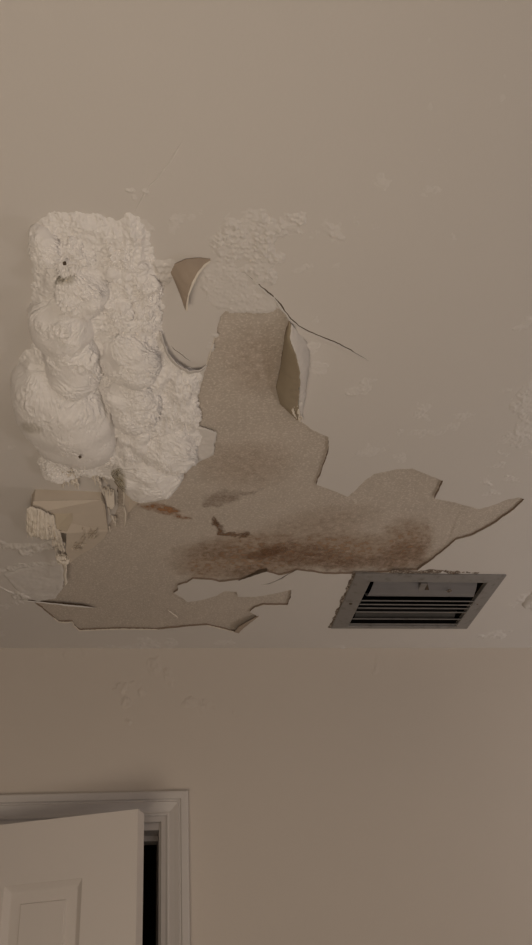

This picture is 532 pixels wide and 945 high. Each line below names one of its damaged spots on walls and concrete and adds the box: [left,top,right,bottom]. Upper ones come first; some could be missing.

crack [245,273,368,361]
peeling [4,308,522,630]
leakage [188,517,422,574]